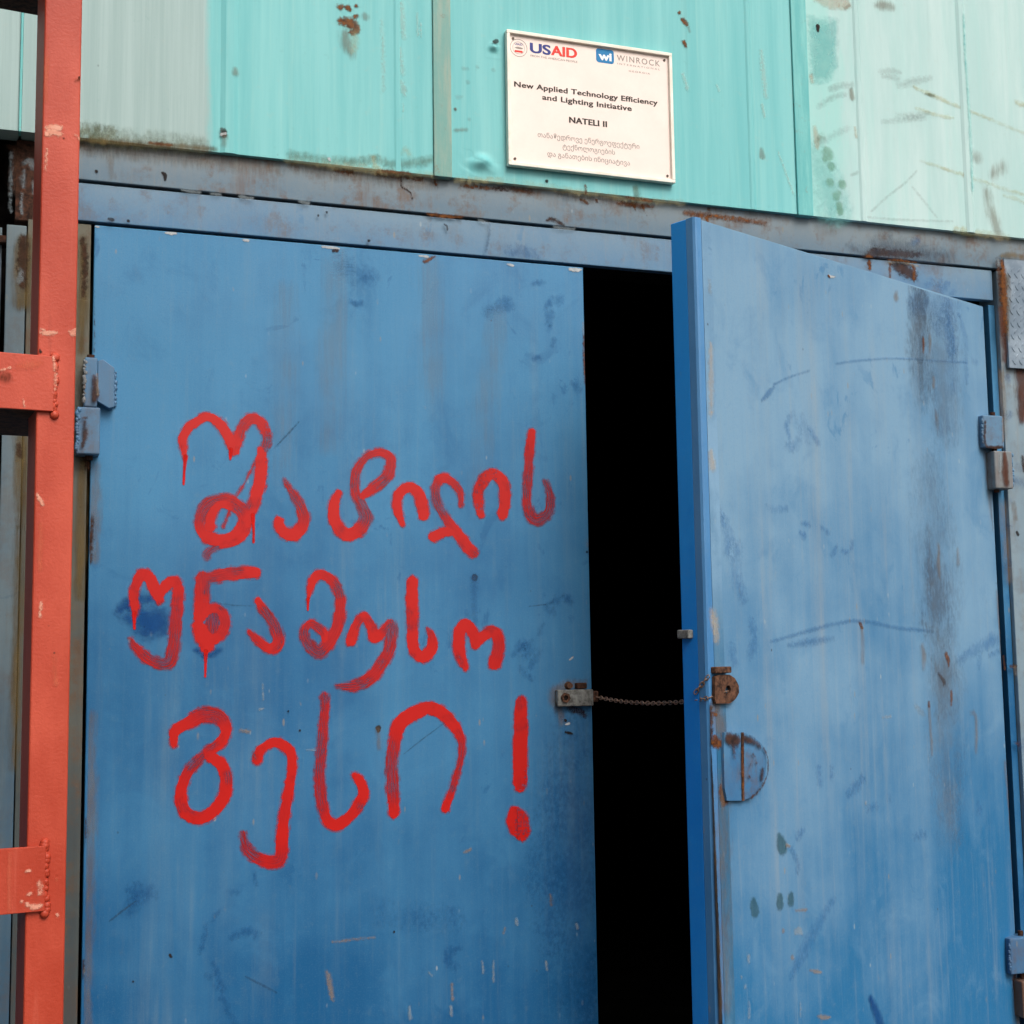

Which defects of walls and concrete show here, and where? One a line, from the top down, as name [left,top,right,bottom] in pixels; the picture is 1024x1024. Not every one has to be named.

corrosion [337,4,360,35]
peeling [45,124,80,167]
corrosion [863,248,922,281]
corrosion [996,253,1022,362]
corrosion [1016,369,1024,423]
corrosion [709,706,769,1024]